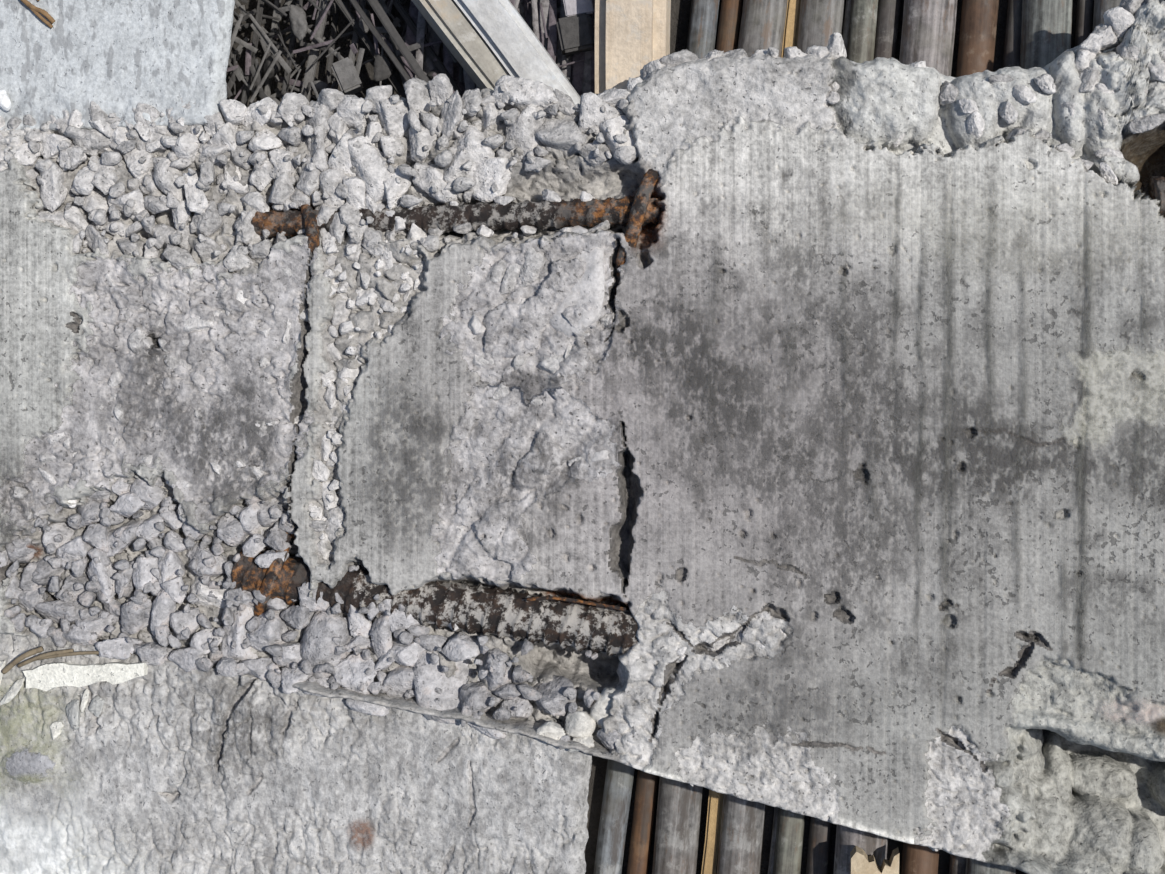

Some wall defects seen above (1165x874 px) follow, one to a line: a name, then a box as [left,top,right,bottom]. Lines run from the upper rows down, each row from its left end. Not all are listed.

corrosion [640,190,663,246]
spalling [627,0,1165,188]
corrosion [1121,127,1165,195]
spalling [1142,176,1165,218]
crack [286,249,314,558]
spalling [0,74,792,771]
corrosion [547,590,629,606]
crack [607,421,644,609]
crack [648,603,790,743]
spalling [914,659,1165,874]